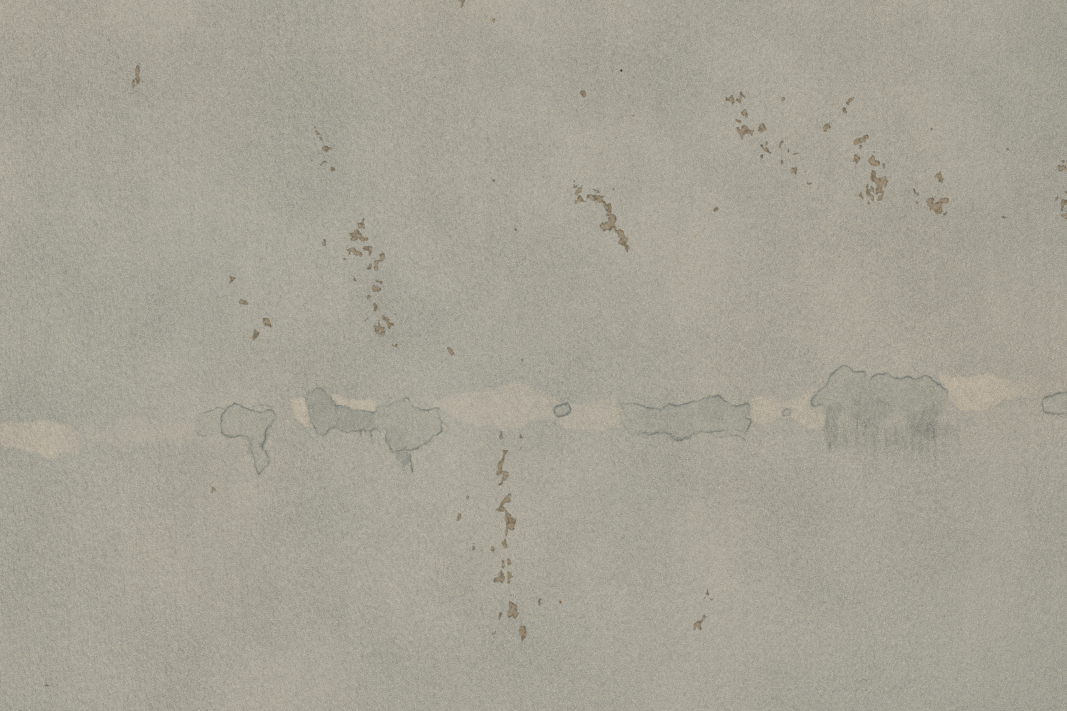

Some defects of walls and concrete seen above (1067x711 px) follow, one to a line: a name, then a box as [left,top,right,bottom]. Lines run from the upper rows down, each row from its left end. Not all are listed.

peeling [573,180,629,252]
peeling [725,92,798,175]
peeling [853,135,888,205]
peeling [913,189,948,215]
peeling [343,218,397,348]
leakage [193,402,278,476]
leakage [304,386,443,472]
leakage [620,394,754,442]
leakage [810,364,949,433]
peeling [491,431,527,641]